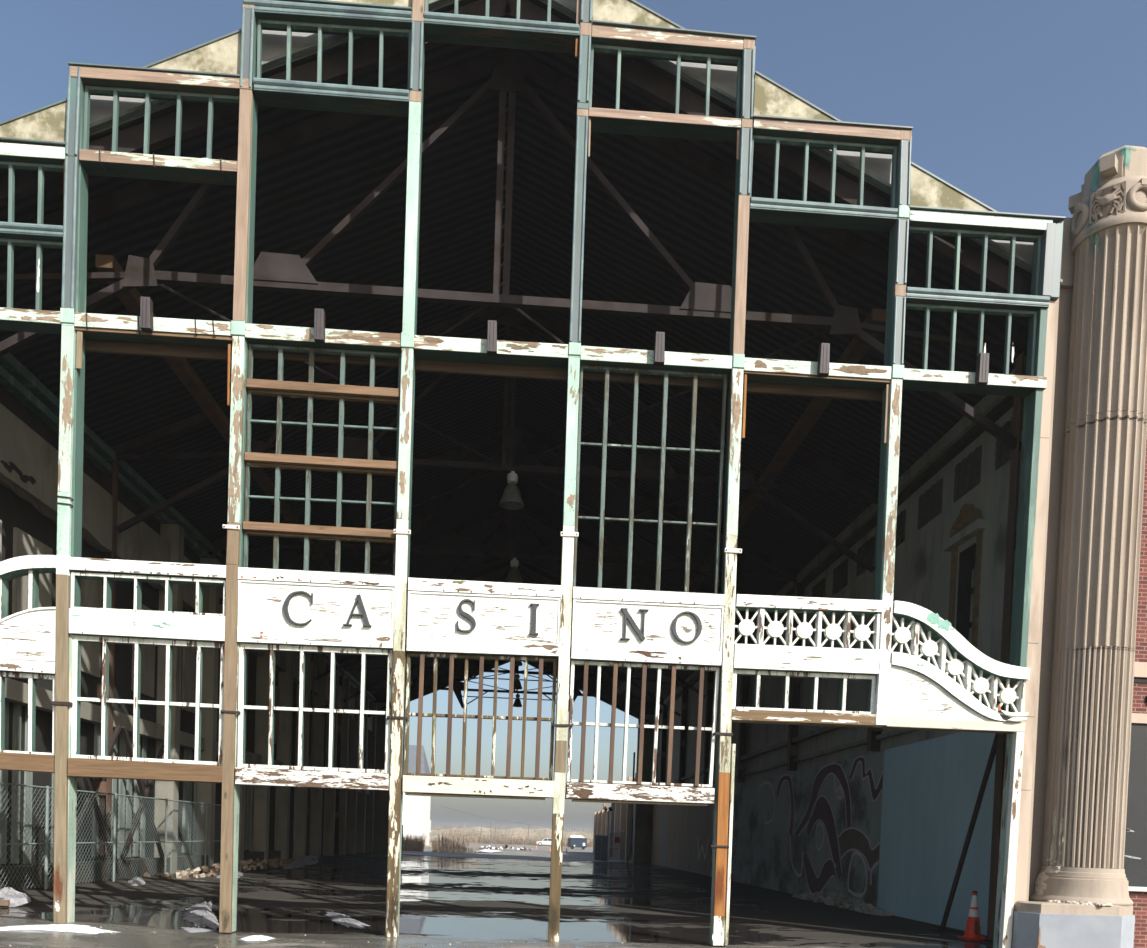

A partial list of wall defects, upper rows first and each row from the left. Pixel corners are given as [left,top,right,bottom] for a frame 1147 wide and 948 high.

peeling [80,314,137,324]
peeling [62,354,73,433]
peeling [231,364,242,443]
peeling [400,374,410,444]
peeling [892,384,900,416]
peeling [228,462,240,503]
peeling [417,580,495,593]
peeling [867,550,895,651]
peeling [927,613,955,631]
peeling [524,644,559,654]
peeling [629,650,681,660]
peeling [661,788,708,800]